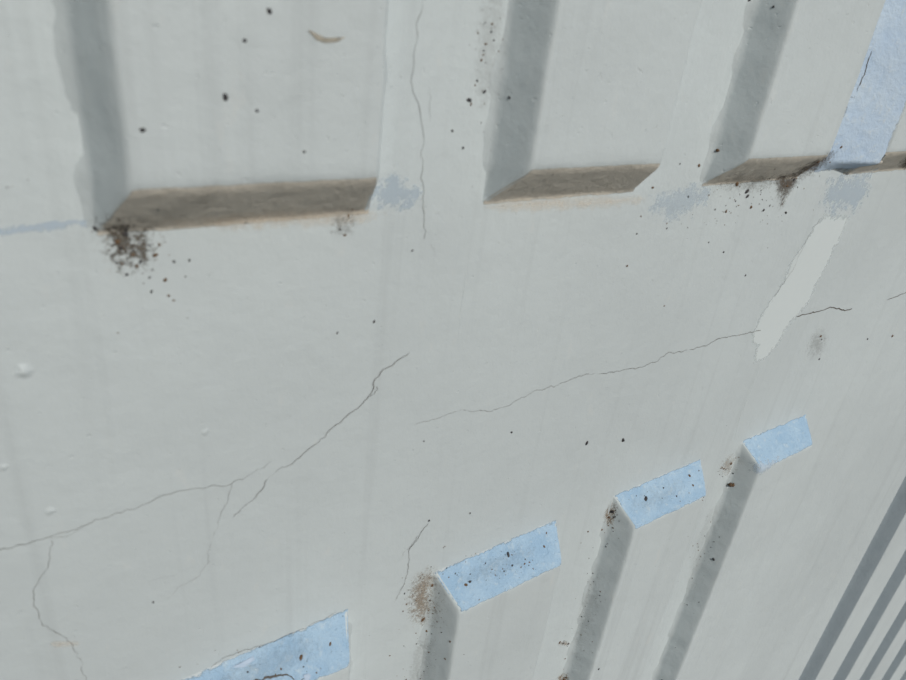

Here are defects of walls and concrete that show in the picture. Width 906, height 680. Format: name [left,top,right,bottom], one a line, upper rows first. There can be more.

crack [0,354,408,674]
crack [255,672,304,680]